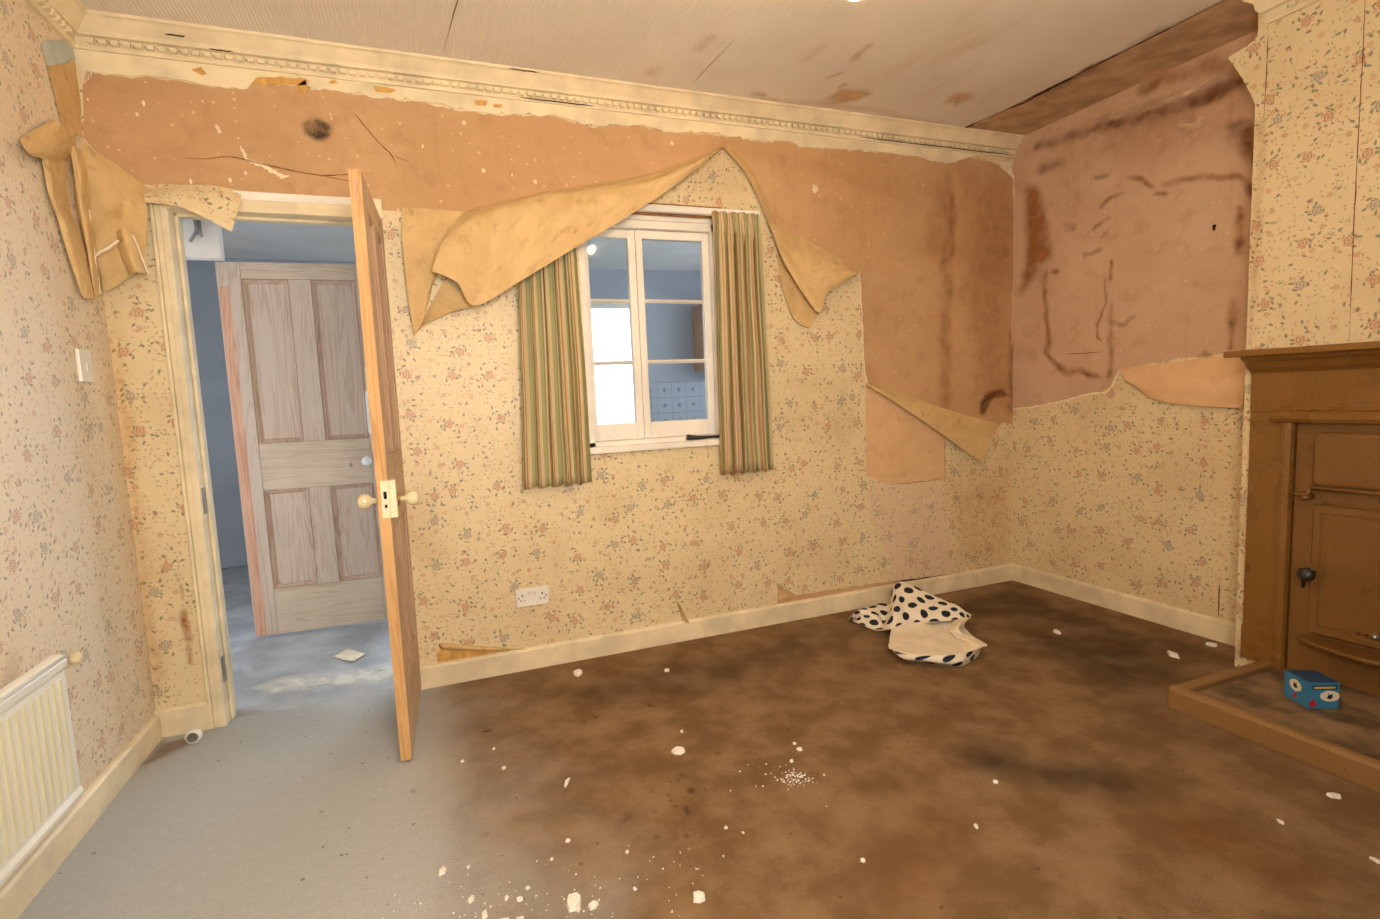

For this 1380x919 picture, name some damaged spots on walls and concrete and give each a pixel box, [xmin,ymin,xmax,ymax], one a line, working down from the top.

leakage [1139,81,1240,119]
crack [190,110,409,181]
leakage [1233,123,1253,152]
peeling [20,26,1269,485]
leakage [1027,189,1058,281]